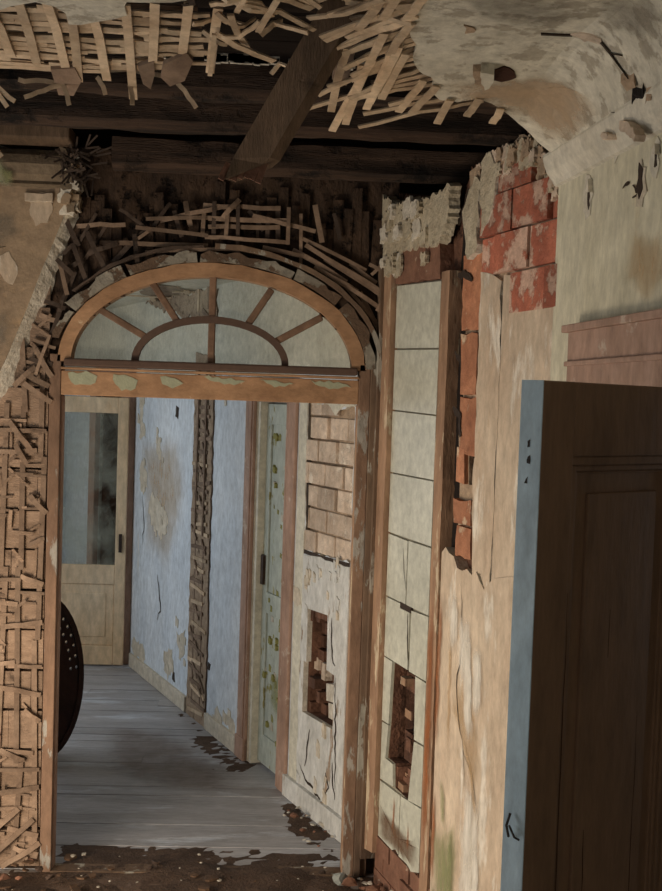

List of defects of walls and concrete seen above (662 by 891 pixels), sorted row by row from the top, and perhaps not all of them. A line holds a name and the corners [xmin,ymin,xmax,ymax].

peeling [473,62,495,90]
leakage [469,81,580,131]
peeling [620,73,652,104]
flaking render [600,120,661,207]
flaking render [0,251,18,285]
flaking render [379,134,559,560]
peeling [68,371,97,385]
peeling [113,374,164,464]
peeling [293,403,356,816]